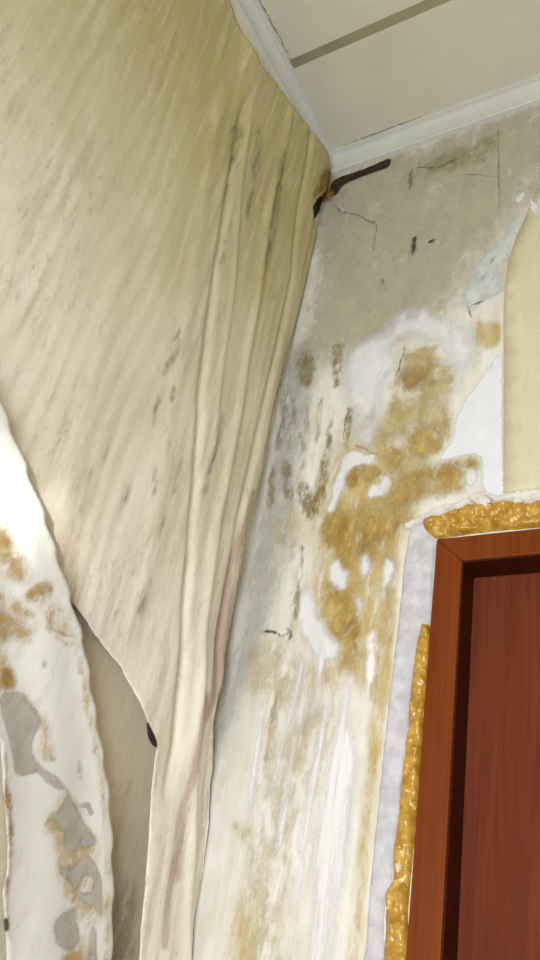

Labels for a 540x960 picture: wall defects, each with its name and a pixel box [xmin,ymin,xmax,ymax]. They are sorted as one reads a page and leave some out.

corrosion [314,169,333,202]
crack [409,128,500,221]
peeling [465,193,538,316]
water stain [186,107,540,960]
peeling [0,693,102,960]
water stain [163,824,185,948]